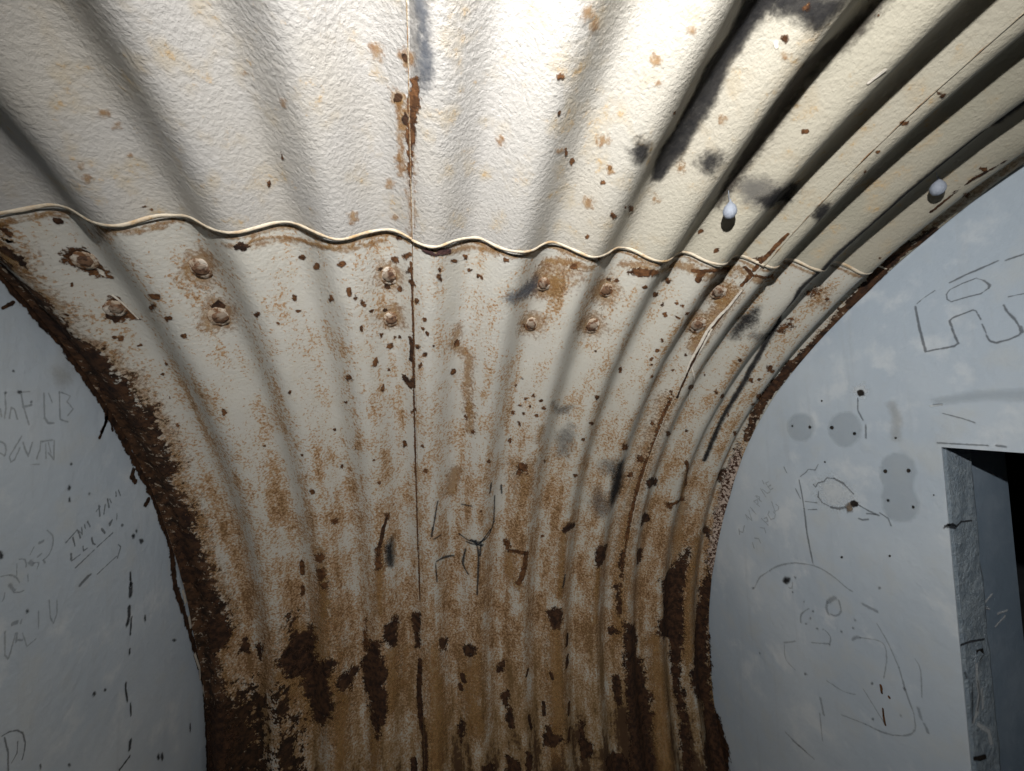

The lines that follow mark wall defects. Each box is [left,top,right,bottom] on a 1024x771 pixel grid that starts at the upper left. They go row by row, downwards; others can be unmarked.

corrosion [386,76,422,209]
corrosion [0,160,1016,771]